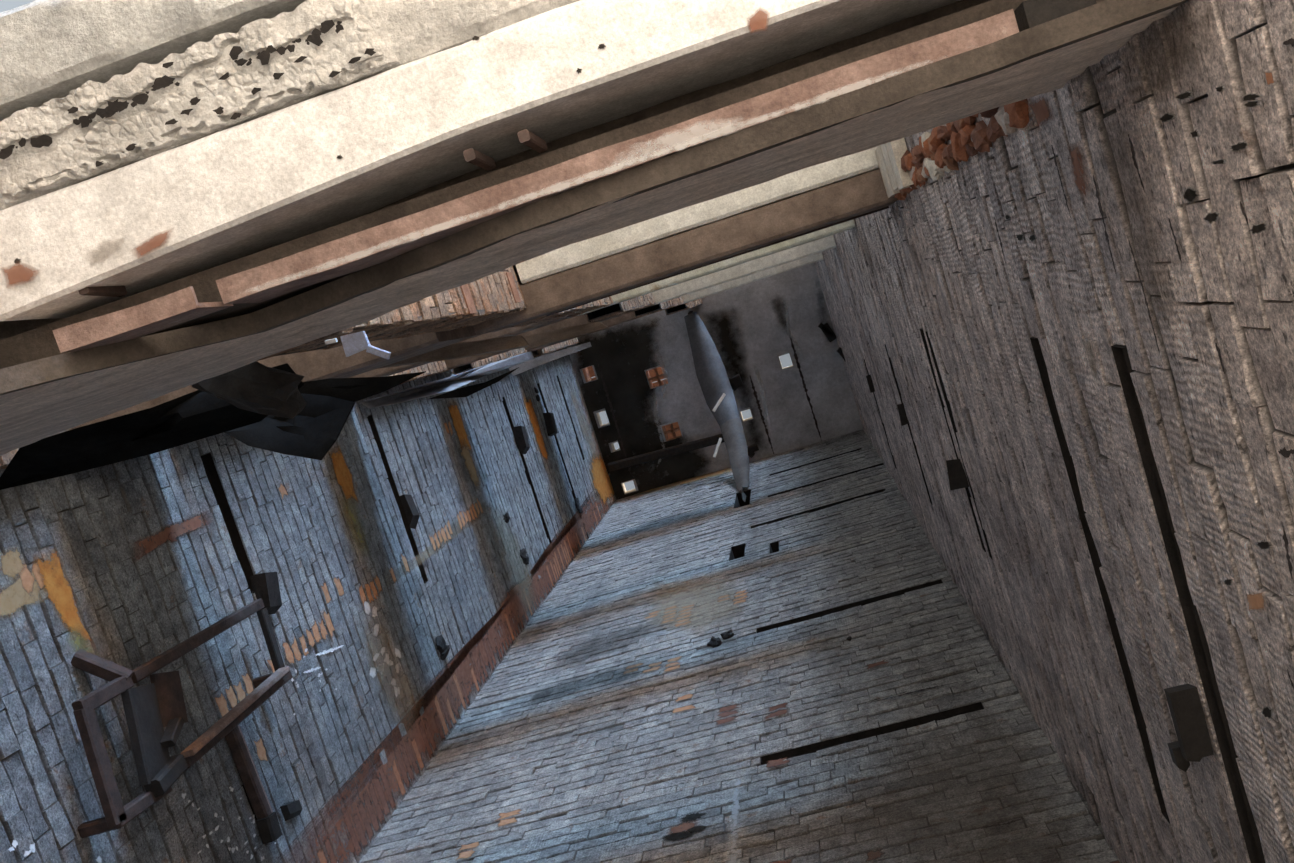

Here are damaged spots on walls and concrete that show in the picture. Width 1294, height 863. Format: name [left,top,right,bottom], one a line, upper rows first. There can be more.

spalling [0,0,400,205]
spalling [875,99,1029,200]
leakage [709,314,763,445]
crack [1278,447,1294,458]
crack [1283,529,1293,579]
peeling [0,563,45,617]
peeling [214,674,254,717]
peeling [267,493,614,863]
peeling [254,738,268,761]
peeling [182,793,264,861]